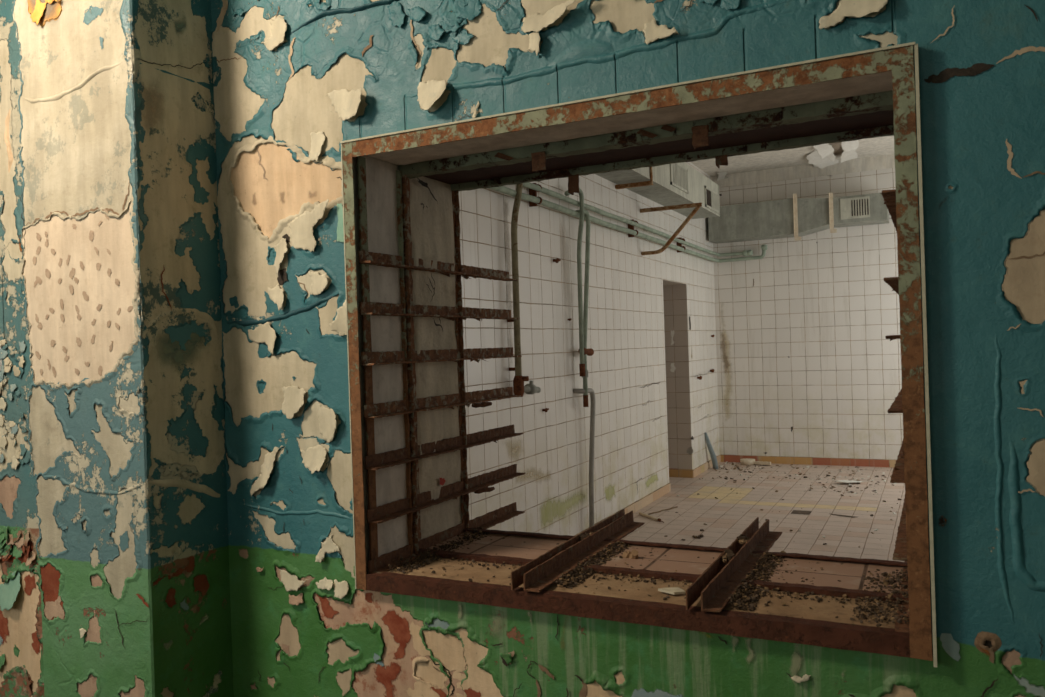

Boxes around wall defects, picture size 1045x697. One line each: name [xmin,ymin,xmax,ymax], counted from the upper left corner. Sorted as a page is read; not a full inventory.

peeling [699,0,741,10]
peeling [800,0,906,50]
peeling [363,0,681,121]
peeling [806,140,859,169]
peeling [995,188,1045,333]
peeling [0,0,523,697]
peeling [1018,434,1045,502]
spalling [658,587,686,595]
spalling [580,665,682,697]
spalling [841,675,924,697]
peeling [940,633,961,661]
peeling [990,644,1045,697]